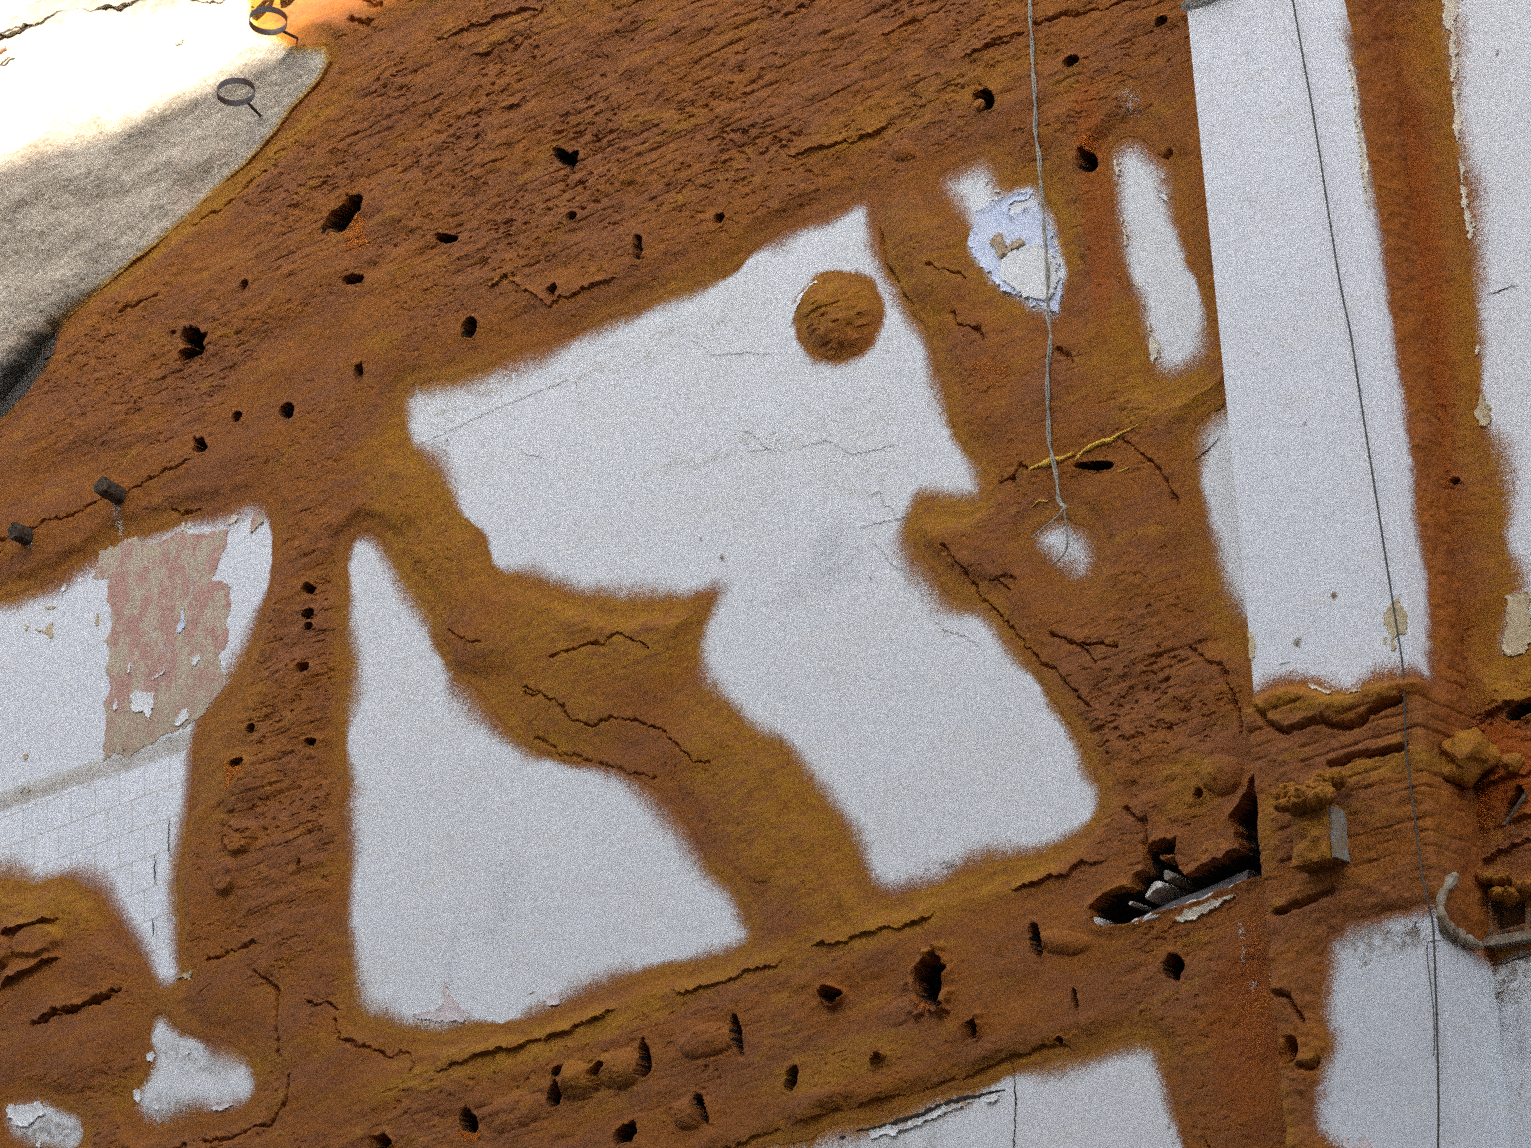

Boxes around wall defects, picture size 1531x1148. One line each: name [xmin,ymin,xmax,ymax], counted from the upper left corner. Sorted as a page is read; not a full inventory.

peeling [1442,0,1463,141]
peeling [1458,159,1477,240]
peeling [967,179,1063,314]
peeling [25,584,66,638]
peeling [92,509,264,761]
peeling [1501,591,1531,656]
crack [522,630,712,781]
crack [30,987,123,1029]
crack [153,937,416,1148]
crack [839,1063,1017,1148]
peeling [869,1093,1001,1139]